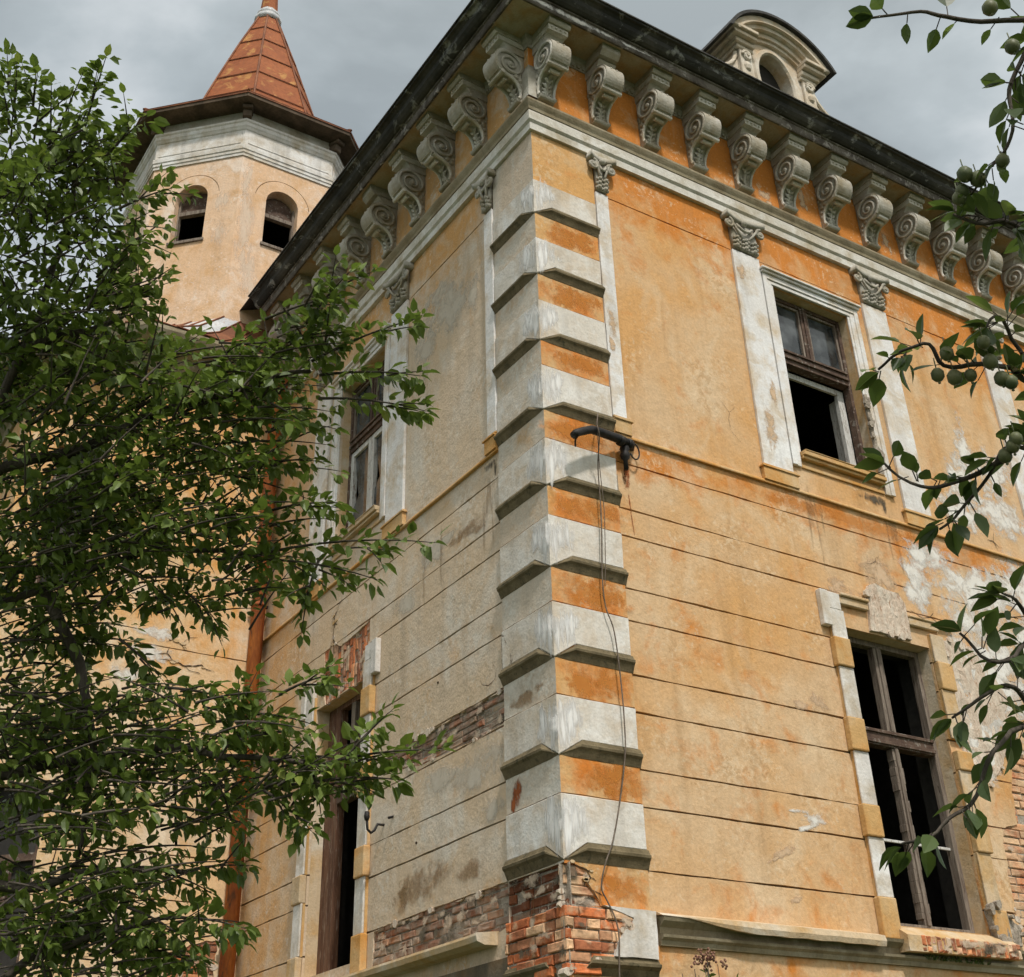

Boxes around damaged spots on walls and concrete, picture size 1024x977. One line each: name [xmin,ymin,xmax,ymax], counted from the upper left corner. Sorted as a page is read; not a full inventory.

crack [159,633,214,673]
spalling [320,619,371,705]
spalling [387,687,505,774]
peeling [828,540,1024,961]
spalling [372,861,635,977]